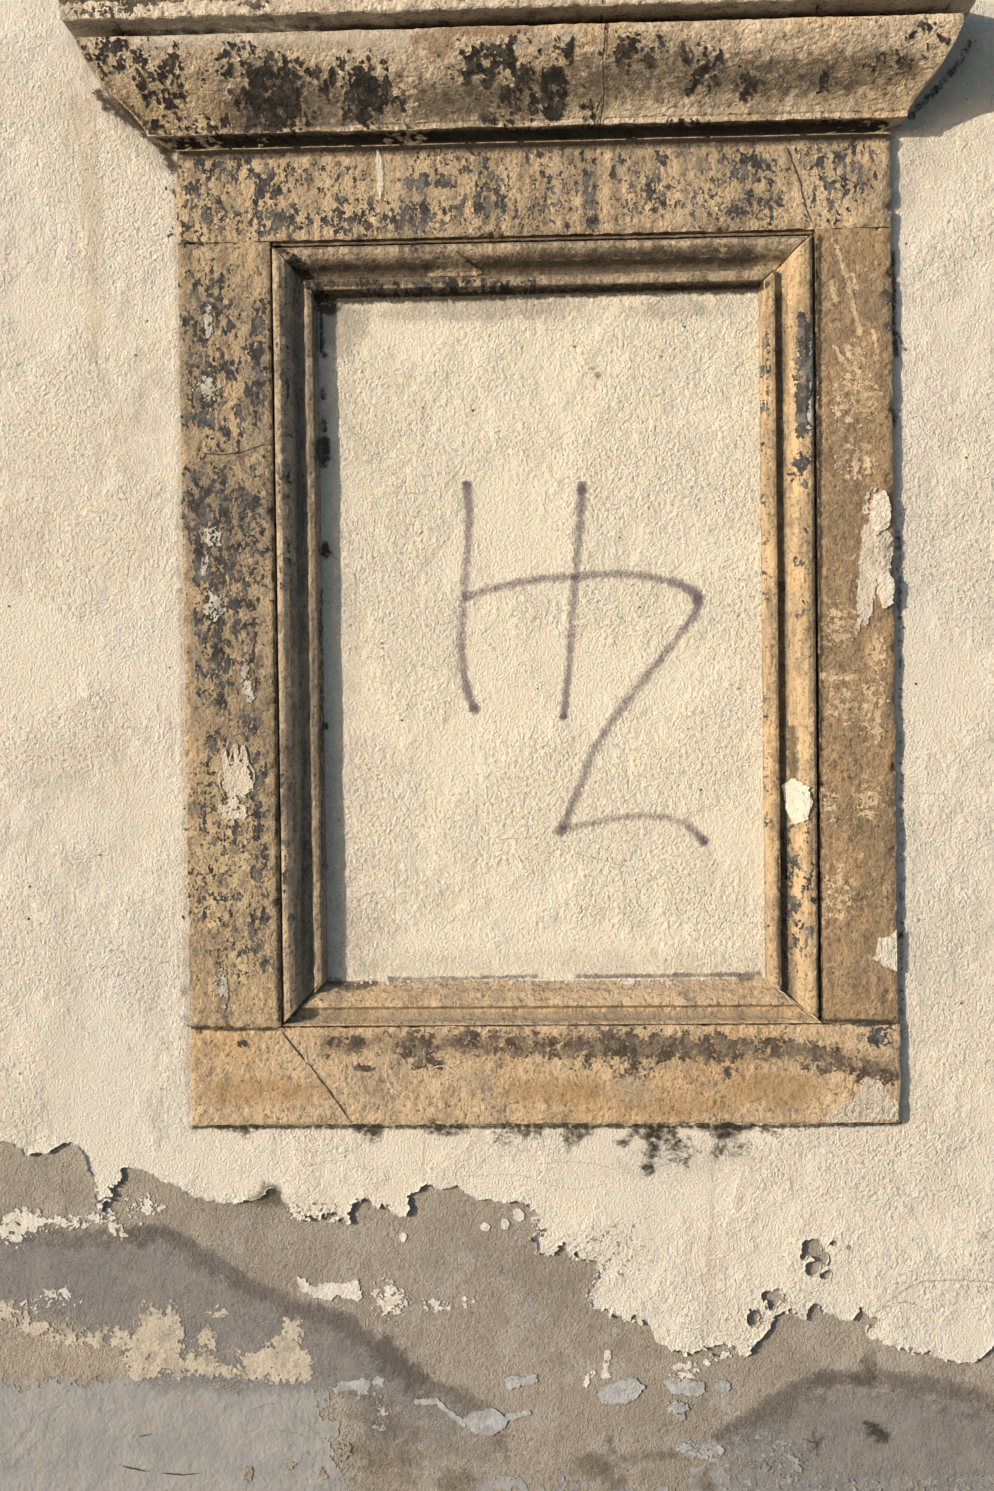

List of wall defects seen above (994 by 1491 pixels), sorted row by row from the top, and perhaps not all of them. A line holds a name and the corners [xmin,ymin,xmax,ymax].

peeling [862,1,954,80]
damp [908,40,972,119]
damp [94,86,177,174]
peeling [68,3,888,1011]
damp [192,1121,902,1176]
peeling [0,1192,170,1249]
damp [129,1226,487,1416]
peeling [297,1276,476,1325]
peeling [414,1398,531,1436]
peeling [661,1350,732,1422]
damp [715,1359,993,1438]
damp [863,1421,888,1442]